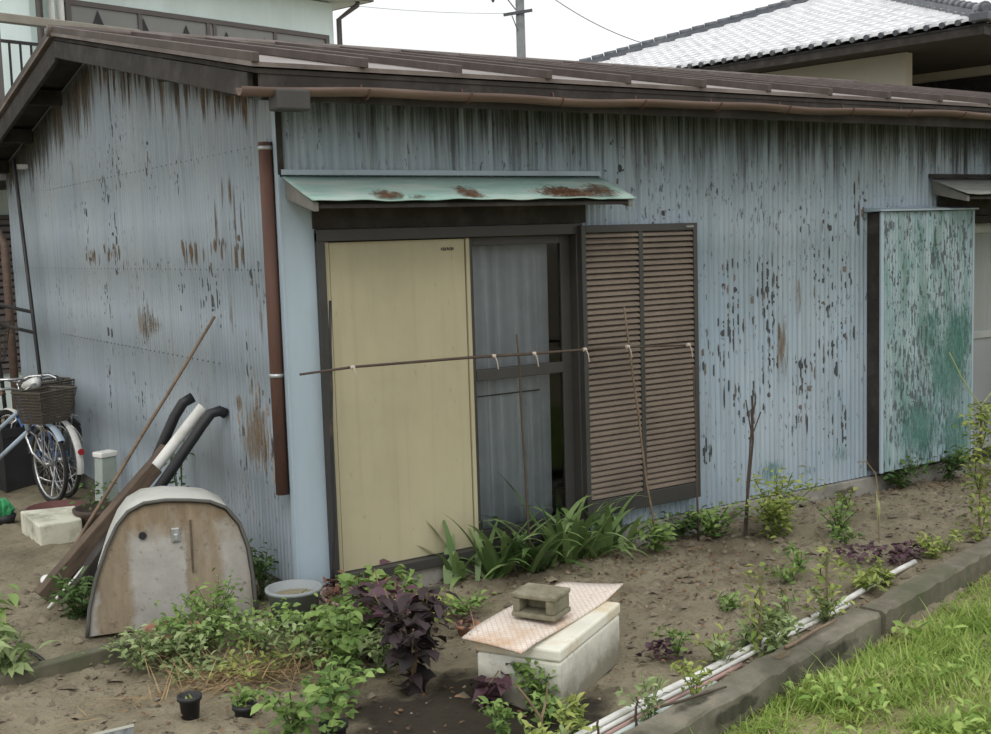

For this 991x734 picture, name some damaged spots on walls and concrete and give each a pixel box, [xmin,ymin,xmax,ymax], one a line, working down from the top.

water stain [0,64,89,185]
water stain [453,108,902,164]
corrosion [373,190,424,198]
corrosion [454,186,485,197]
corrosion [537,184,619,197]
corrosion [181,179,244,269]
corrosion [86,244,124,269]
corrosion [778,330,788,360]
peeling [903,276,972,464]